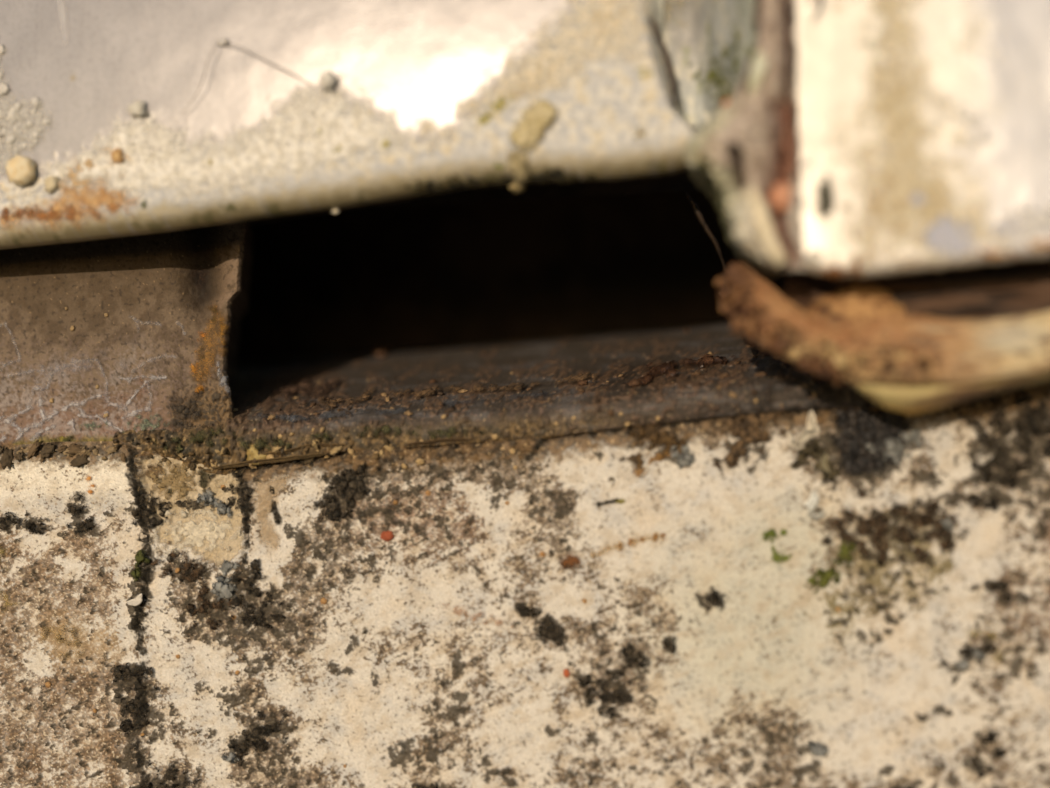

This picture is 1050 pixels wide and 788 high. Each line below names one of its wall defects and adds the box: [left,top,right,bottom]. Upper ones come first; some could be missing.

water stain [47,86,406,197]
corrosion [0,155,125,227]
corrosion [191,306,226,391]
water stain [621,424,686,477]
water stain [713,406,786,473]
water stain [833,404,909,476]
crack [0,359,166,788]